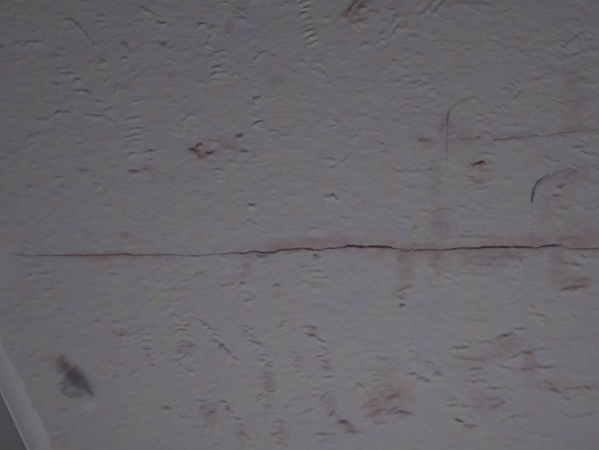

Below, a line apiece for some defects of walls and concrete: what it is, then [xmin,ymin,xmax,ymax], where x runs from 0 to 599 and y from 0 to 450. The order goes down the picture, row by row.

crack [226,244,599,254]